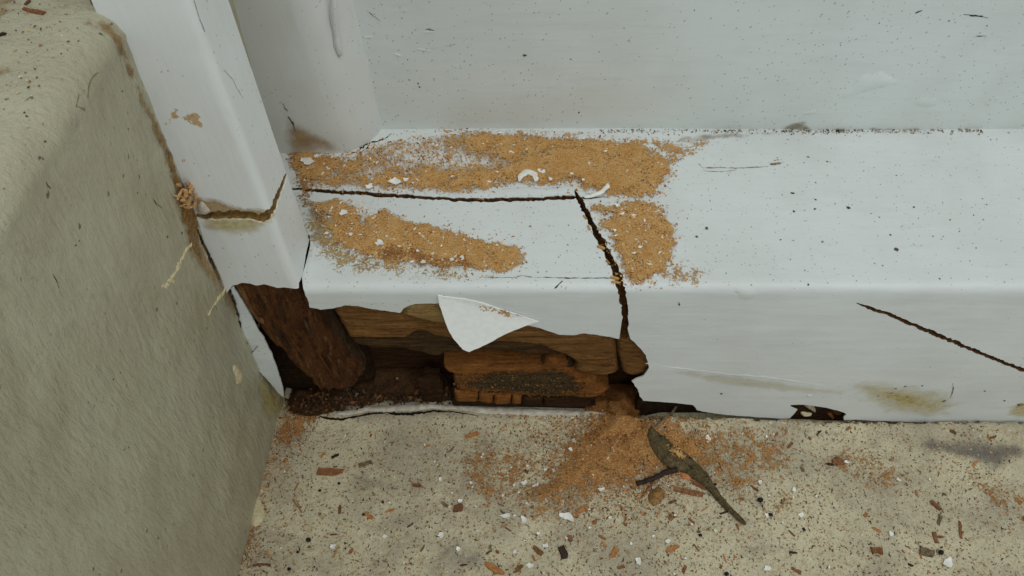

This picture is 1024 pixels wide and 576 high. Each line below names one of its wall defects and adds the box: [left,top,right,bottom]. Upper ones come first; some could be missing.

crack [485,273,609,281]
peeling [208,285,284,397]
peeling [438,295,539,352]
crack [857,303,1024,372]
spalling [788,404,847,421]